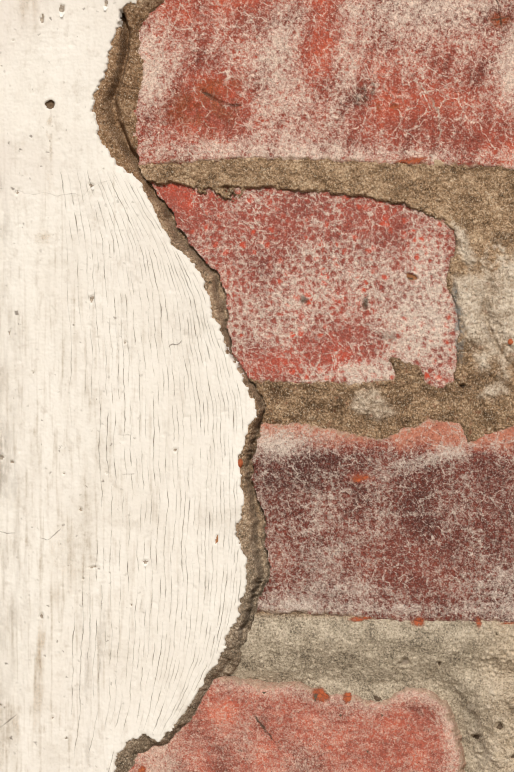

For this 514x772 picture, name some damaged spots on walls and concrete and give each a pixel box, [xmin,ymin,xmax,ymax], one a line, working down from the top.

spalling [92,0,271,772]
spalling [312,688,329,702]